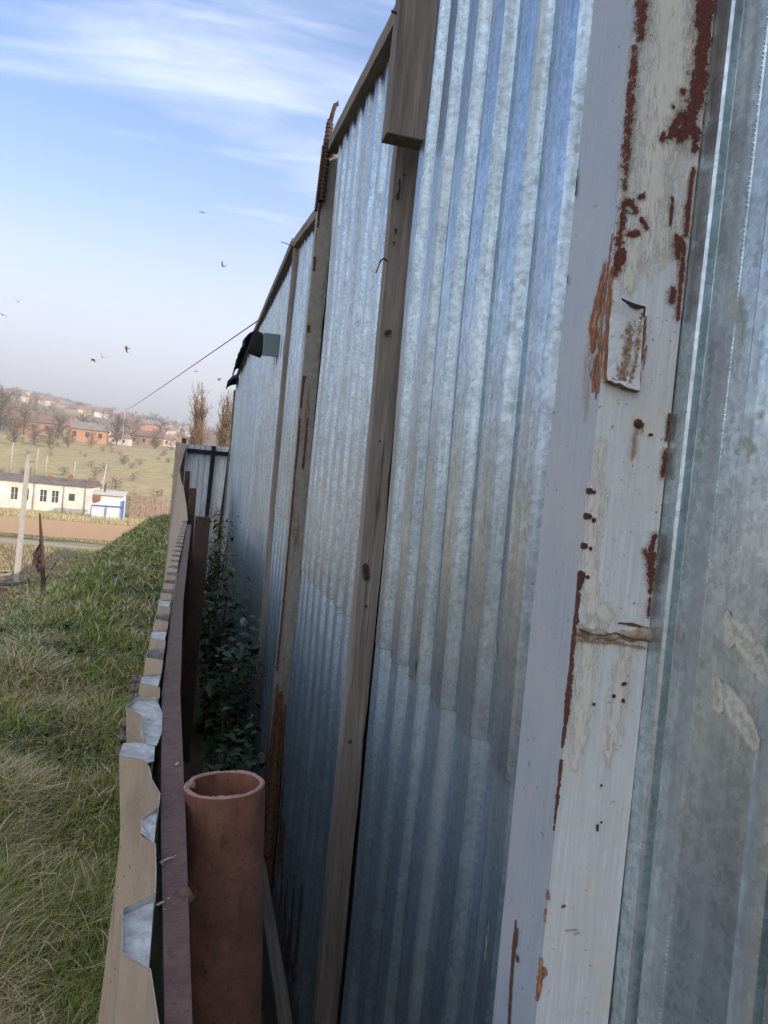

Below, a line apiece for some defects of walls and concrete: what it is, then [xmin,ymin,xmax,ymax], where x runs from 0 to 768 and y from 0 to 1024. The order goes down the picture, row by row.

peeling [610,0,717,321]
corrosion [553,570,590,831]
peeling [569,440,639,772]
corrosion [507,920,519,1024]
corrosion [535,957,548,1001]